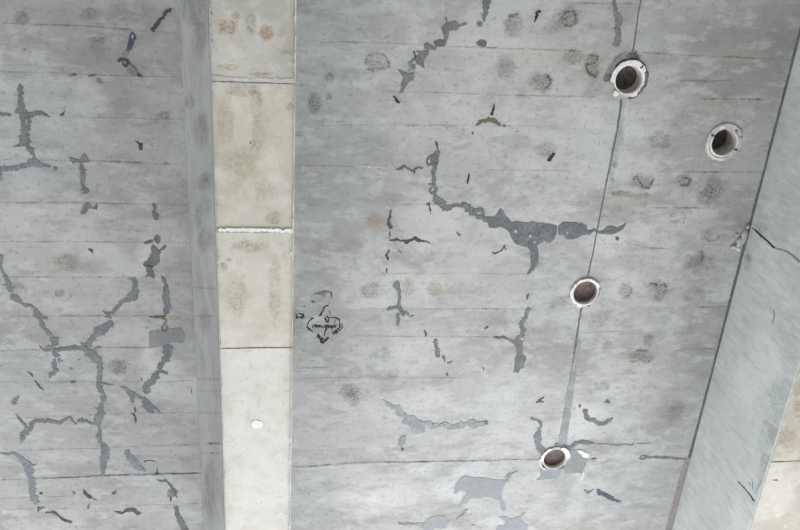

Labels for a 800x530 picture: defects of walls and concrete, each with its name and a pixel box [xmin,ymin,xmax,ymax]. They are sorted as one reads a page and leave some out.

crack [117,8,181,77]
crack [398,0,491,93]
crack [0,84,90,194]
crack [151,203,159,221]
crack [385,210,431,326]
crack [396,142,626,274]
crack [571,29,800,461]
crack [0,245,204,530]
crack [383,399,488,435]
crack [493,307,531,373]